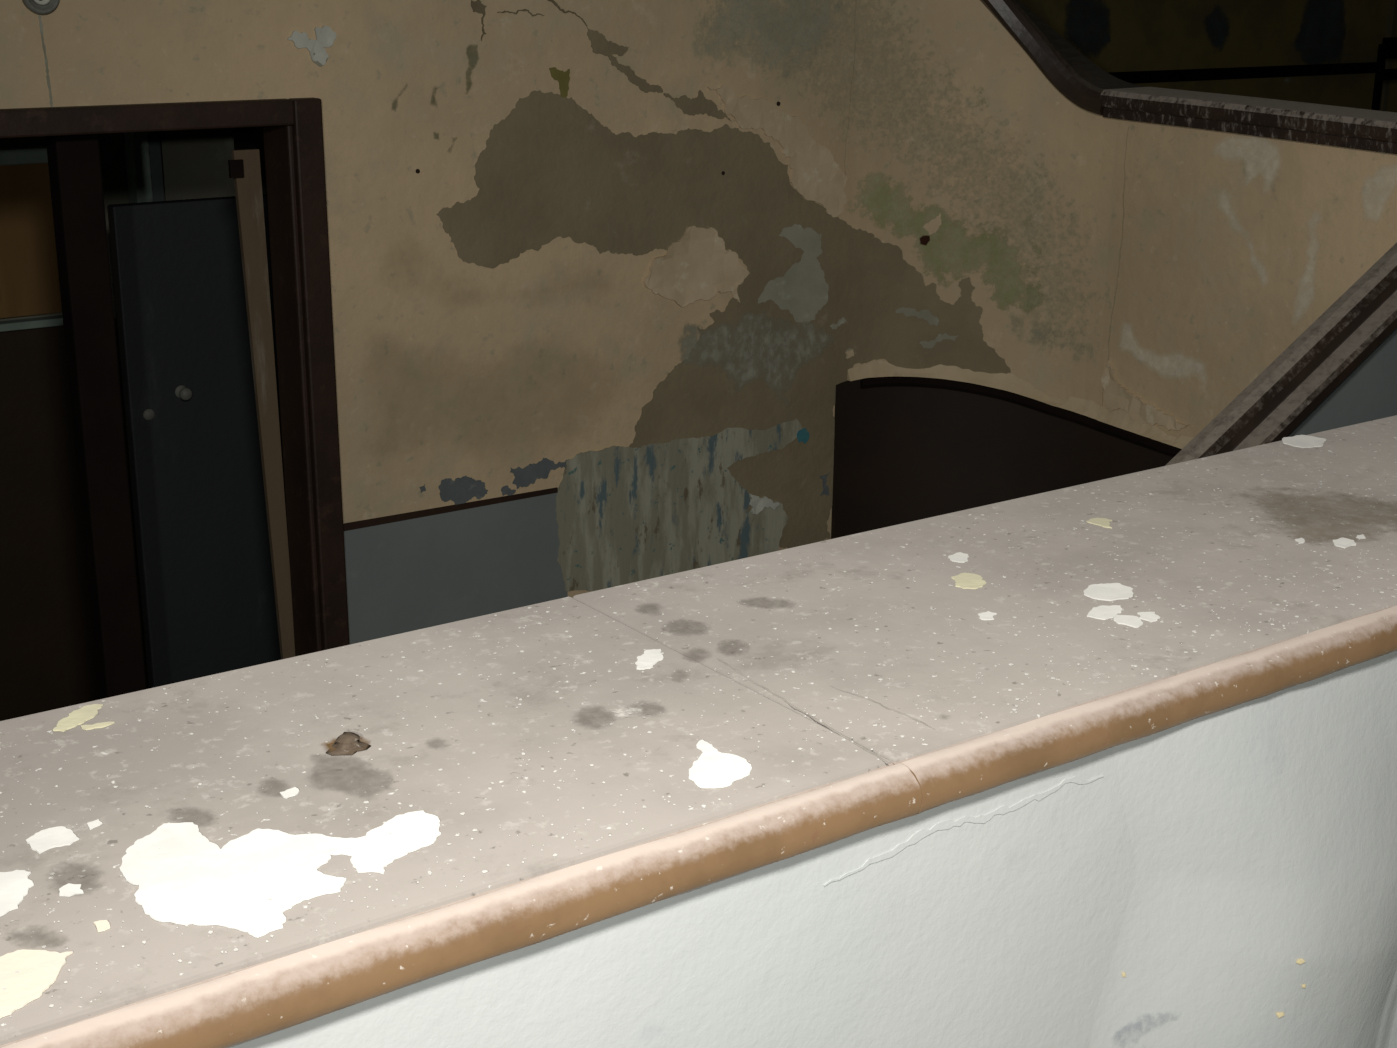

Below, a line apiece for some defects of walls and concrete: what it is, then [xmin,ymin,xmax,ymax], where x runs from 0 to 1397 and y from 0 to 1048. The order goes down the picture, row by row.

crack [471,0,731,121]
leakage [855,174,1042,310]
peeling [419,67,1011,591]
peeling [1083,583,1160,628]
peeling [53,704,114,732]
peeling [280,787,299,799]
peeling [26,819,102,854]
peeling [0,870,34,917]
peeling [59,883,84,897]
peeling [120,810,441,938]
peeling [93,920,110,932]
peeling [0,949,73,1018]